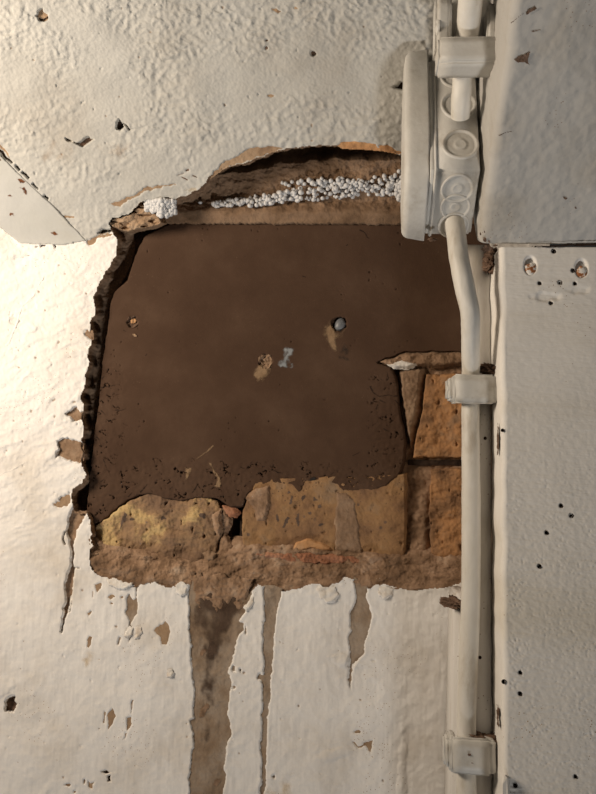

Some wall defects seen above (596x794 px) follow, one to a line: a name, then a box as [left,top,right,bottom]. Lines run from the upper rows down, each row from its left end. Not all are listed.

spalling [111,141,401,212]
flaking render [54,227,462,562]
spalling [92,578,142,645]
spalling [154,621,170,645]
water stain [195,593,239,660]
spalling [103,708,116,729]